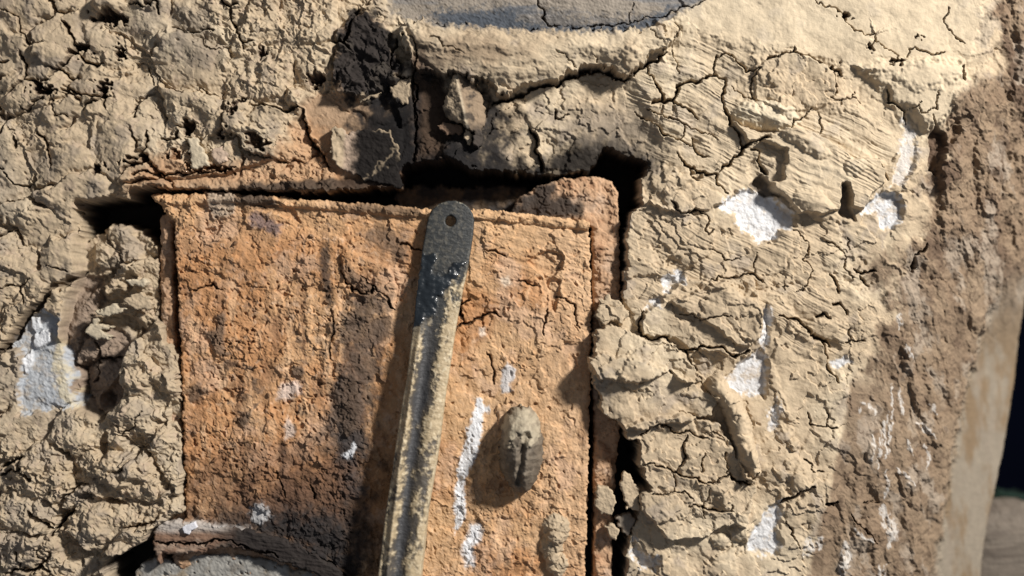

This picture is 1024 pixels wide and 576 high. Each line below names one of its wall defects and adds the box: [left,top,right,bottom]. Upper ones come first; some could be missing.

crack [0,8,108,188]
peeling [360,78,411,105]
peeling [437,73,486,149]
crack [491,0,861,194]
crack [815,0,966,125]
peeling [329,126,404,189]
peeling [341,250,398,308]
peeling [527,251,564,311]
crack [669,200,877,384]
crack [638,310,751,385]
crack [639,423,760,520]
water stain [459,522,485,570]